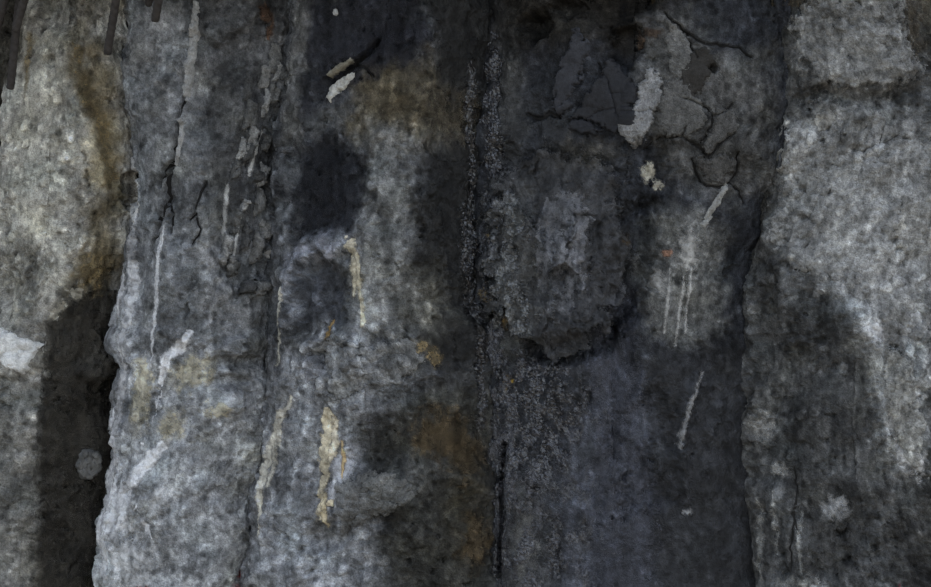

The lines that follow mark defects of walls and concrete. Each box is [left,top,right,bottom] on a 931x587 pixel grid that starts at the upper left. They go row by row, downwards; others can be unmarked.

crack [665,13,751,58]
rust [70,42,120,188]
crack [156,99,207,245]
flaking render [551,18,740,228]
crack [645,103,744,204]
leakage [458,32,663,587]